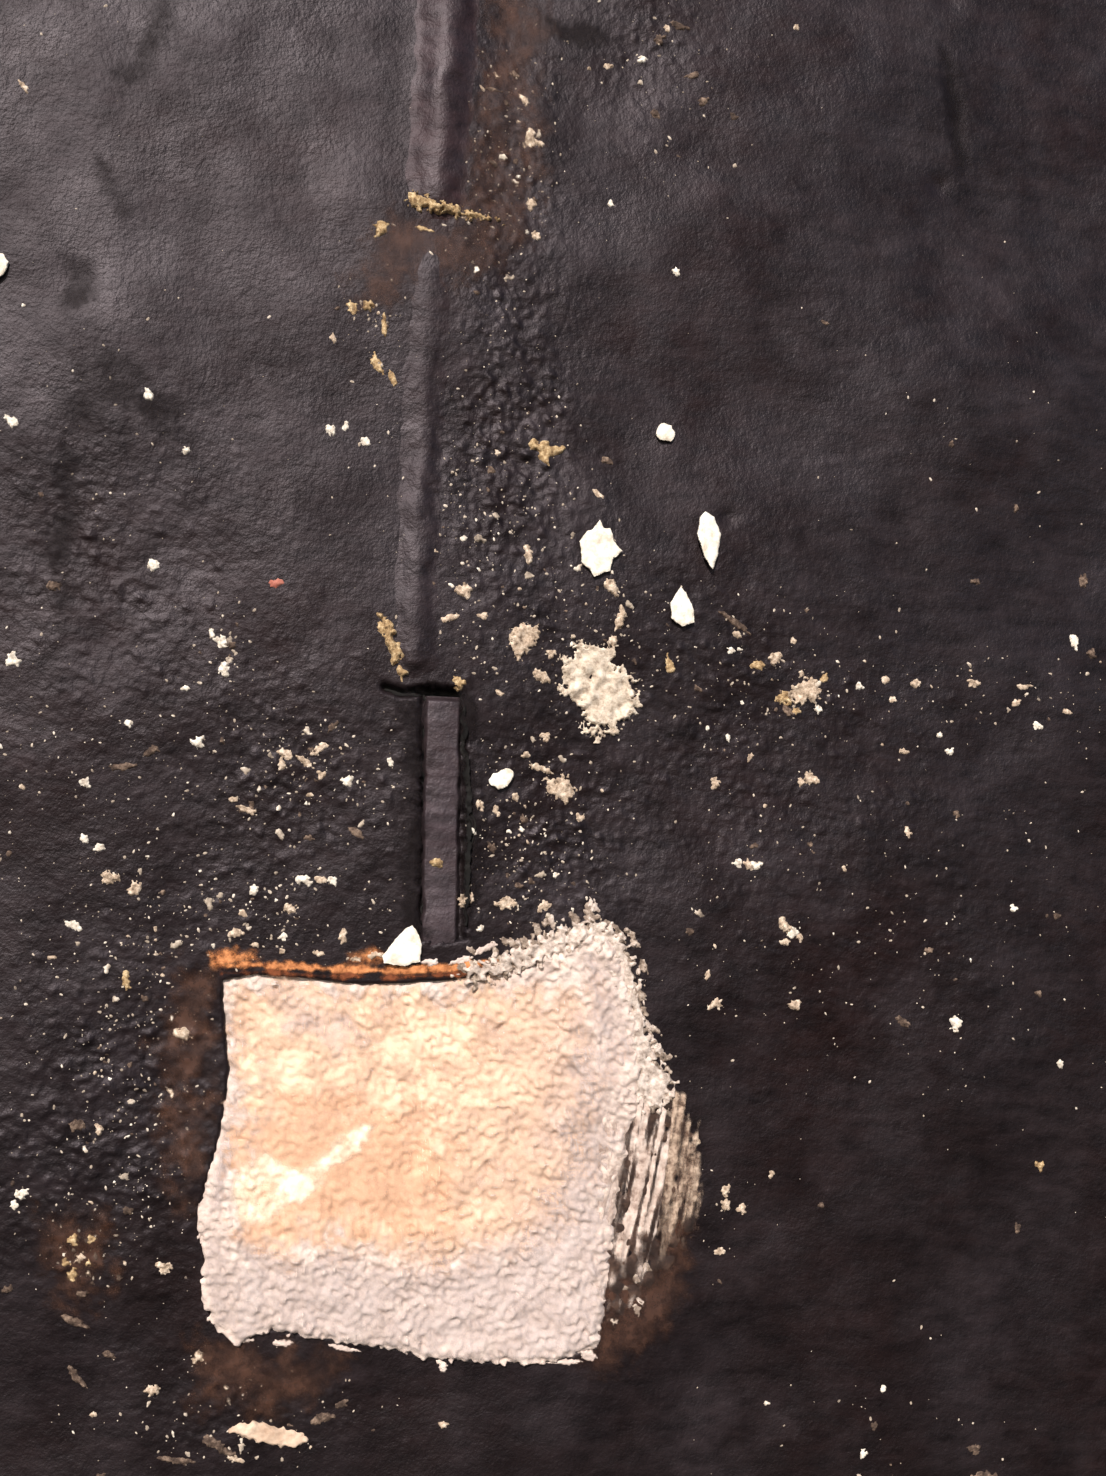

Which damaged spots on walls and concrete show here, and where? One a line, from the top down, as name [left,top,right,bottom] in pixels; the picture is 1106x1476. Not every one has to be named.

peeling [373,221,394,238]
peeling [329,278,406,388]
peeling [881,661,943,719]
peeling [937,646,1100,759]
peeling [1049,635,1102,689]
crack [384,686,476,926]
spalling [0,389,865,1372]
corrosion [210,941,499,980]
peeling [940,1014,963,1053]
peeling [67,1365,88,1388]
peeling [837,1385,886,1476]
peeling [967,1444,1004,1476]